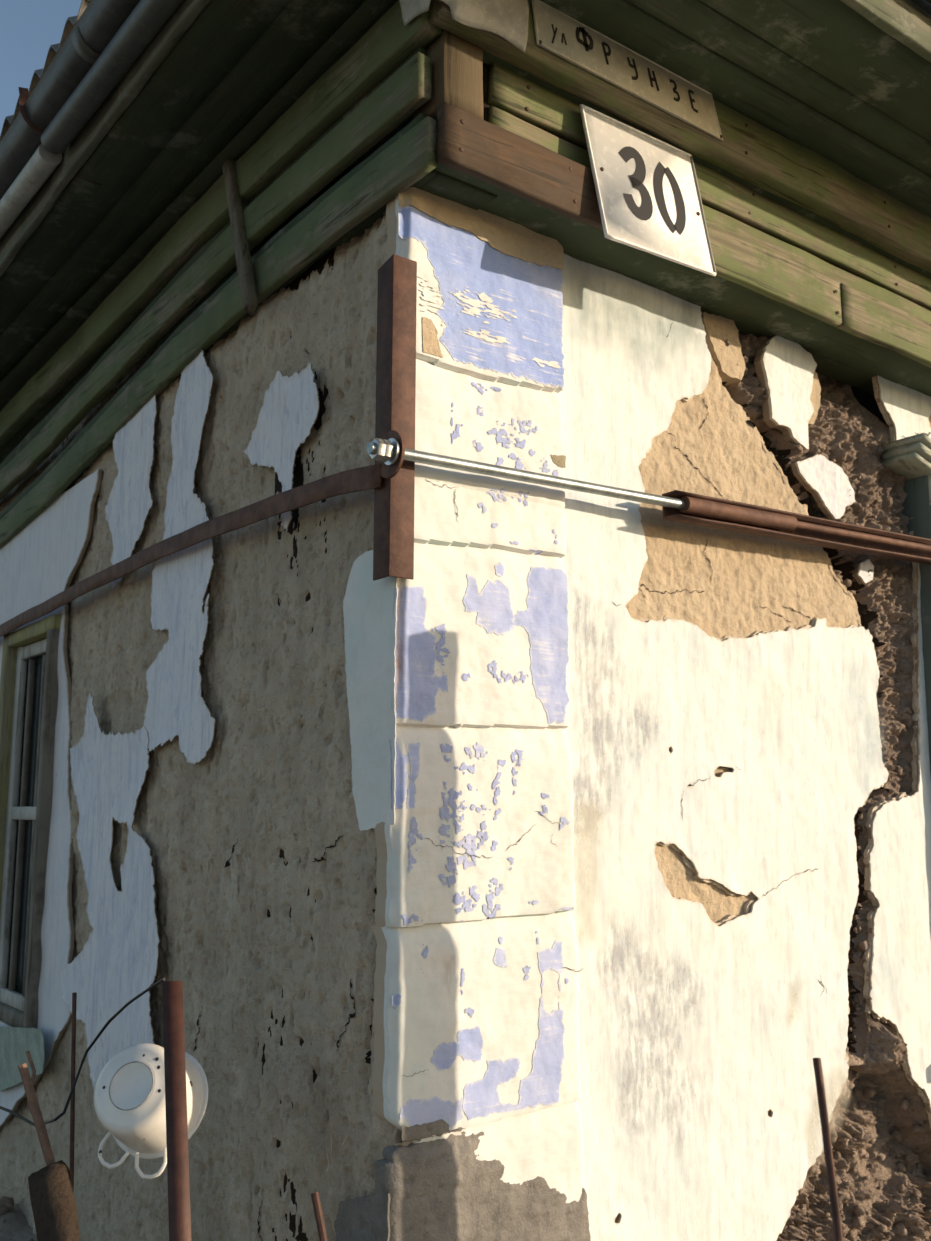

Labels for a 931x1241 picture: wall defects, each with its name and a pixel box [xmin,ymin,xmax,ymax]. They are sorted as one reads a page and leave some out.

spalling [625,312,874,639]
peeling [0,187,591,1241]
crack [425,811,558,858]
spalling [655,843,754,923]
crack [722,329,931,1066]